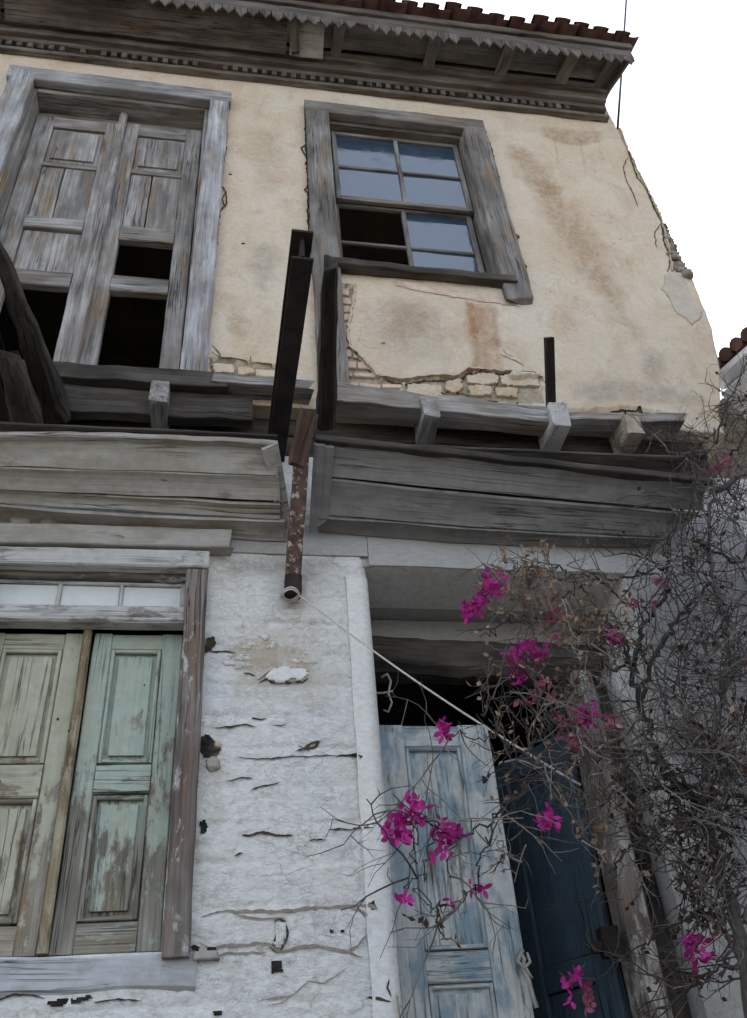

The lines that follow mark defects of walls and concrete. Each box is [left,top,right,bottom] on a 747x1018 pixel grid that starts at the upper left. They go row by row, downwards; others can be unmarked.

crack [623,151,670,271]
spalling [393,280,520,307]
flaking render [342,288,545,404]
peeling [223,633,317,684]
crack [213,717,286,728]
spalling [200,734,221,772]
crack [229,740,363,791]
crack [235,826,372,856]
crack [190,915,289,956]
crack [257,904,378,1005]
crack [0,992,44,1000]
crack [93,996,139,1004]